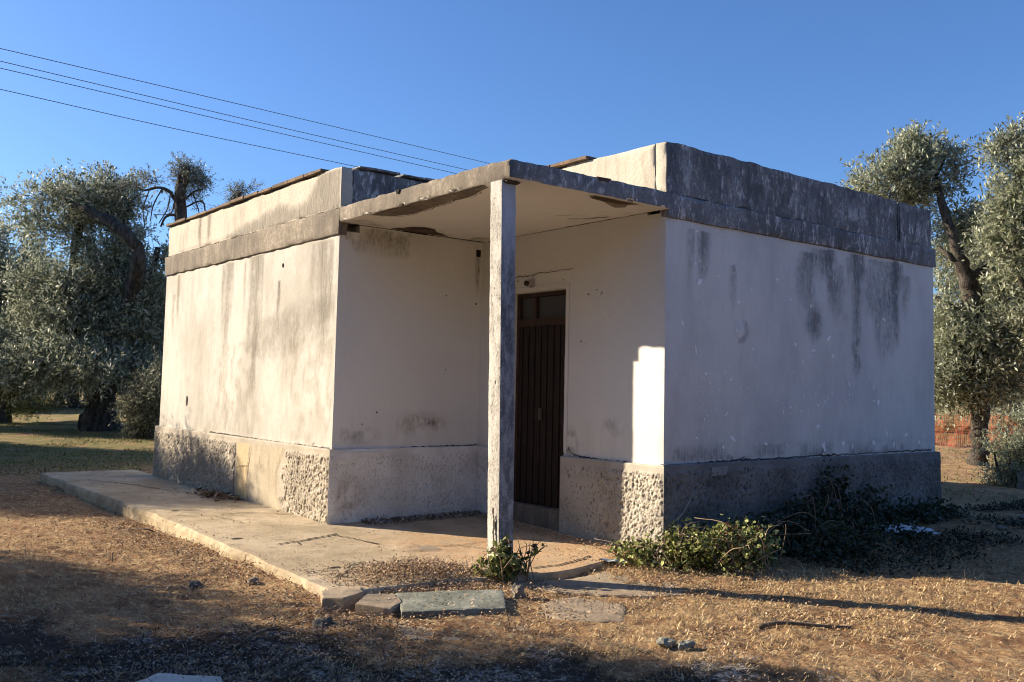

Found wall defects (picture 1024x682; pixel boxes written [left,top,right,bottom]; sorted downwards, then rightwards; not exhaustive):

spalling [372,185,488,237]
spalling [590,196,637,208]